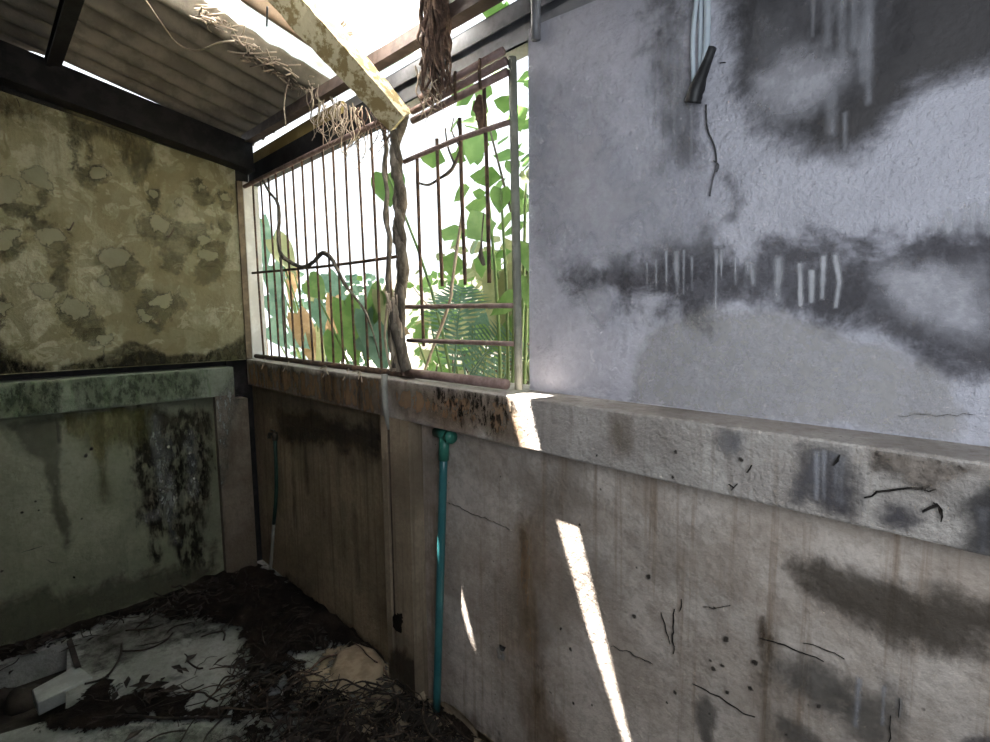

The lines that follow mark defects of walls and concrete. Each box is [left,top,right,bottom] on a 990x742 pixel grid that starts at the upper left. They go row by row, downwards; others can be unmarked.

damp [729,0,990,153]
damp [65,111,156,183]
peeling [0,165,113,347]
peeling [97,247,187,332]
peeling [137,179,232,283]
damp [569,224,990,375]
damp [0,349,46,374]
damp [61,337,381,457]
rust [391,388,523,443]
damp [0,385,232,646]
crack [864,486,943,522]
damp [790,560,990,656]